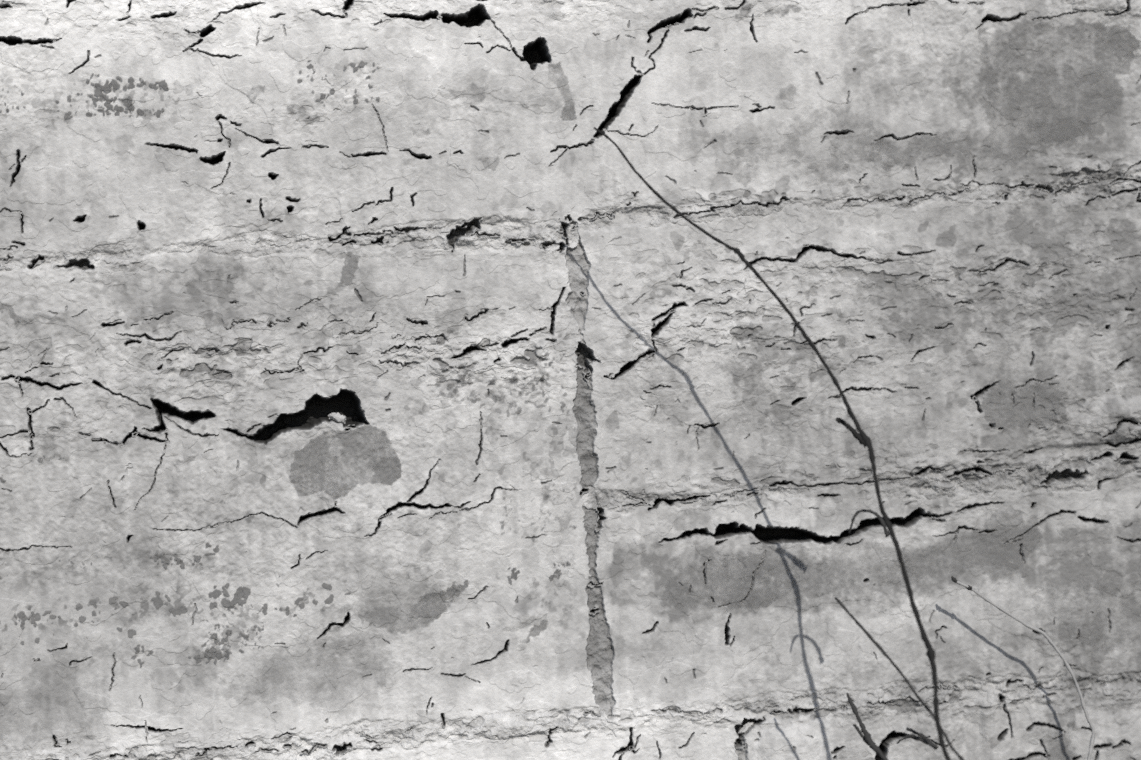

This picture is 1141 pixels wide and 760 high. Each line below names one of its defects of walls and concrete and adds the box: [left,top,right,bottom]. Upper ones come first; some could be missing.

crack [116,0,355,59]
crack [374,0,512,49]
crack [845,0,1131,30]
crack [548,0,775,167]
crack [101,311,184,371]
crack [603,245,1030,407]
crack [0,347,345,569]
crack [364,411,517,537]
crack [1090,418,1141,490]
crack [620,448,1141,647]
crack [875,731,954,760]
crack [997,678,1135,760]